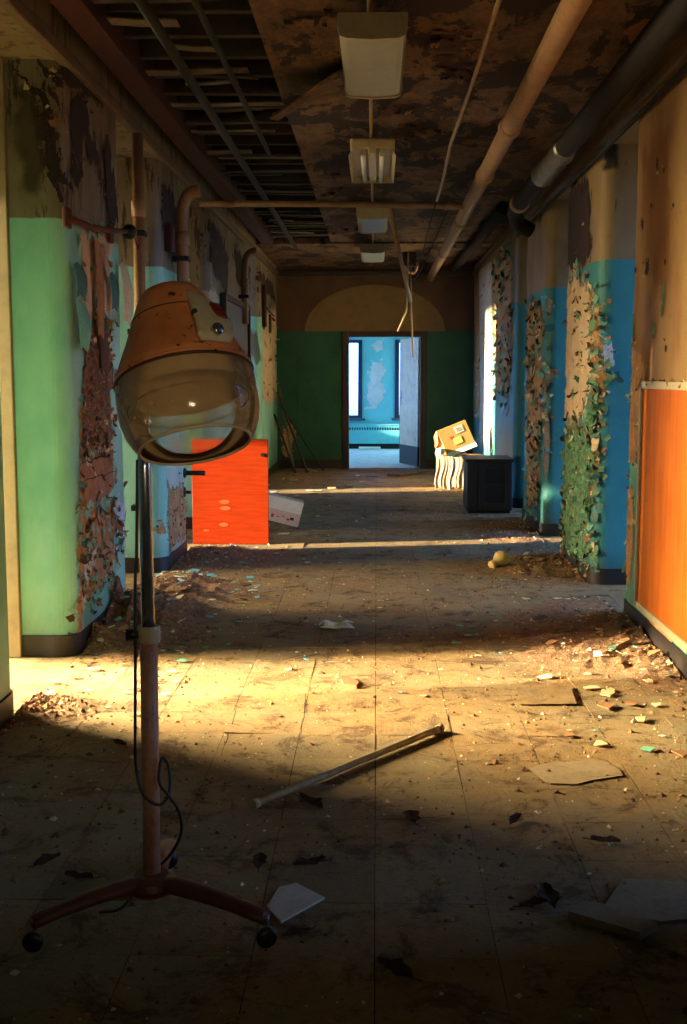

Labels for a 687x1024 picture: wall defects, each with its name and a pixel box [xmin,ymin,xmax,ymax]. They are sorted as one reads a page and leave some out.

damp [603,144,618,171]
flaking render [22,59,133,638]
peeling [364,339,386,410]
peeling [473,176,685,599]
peeling [153,473,187,558]